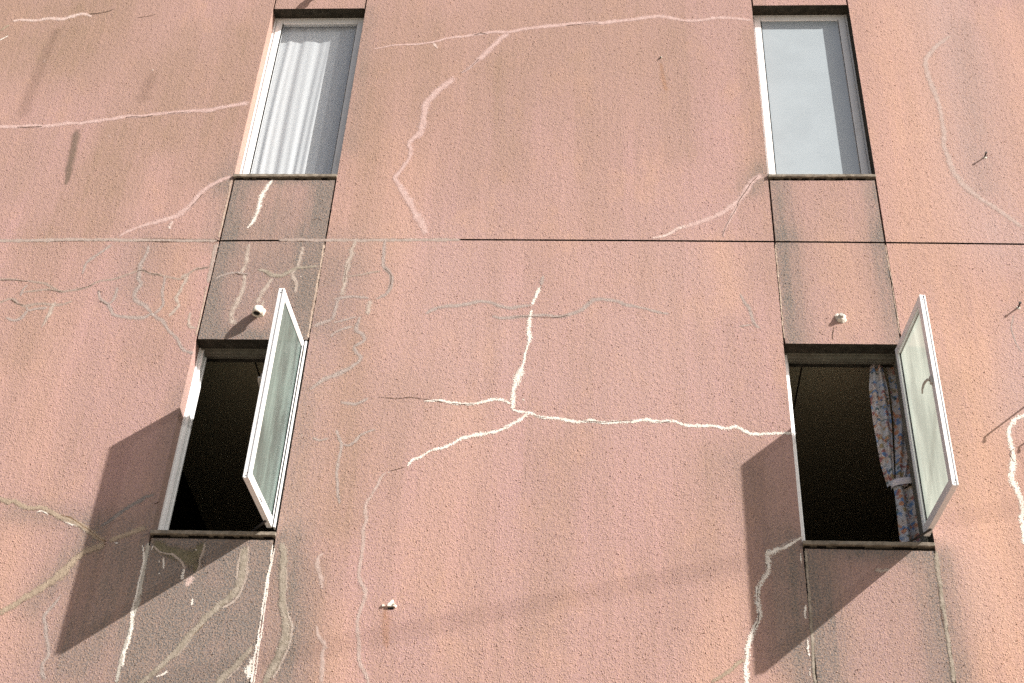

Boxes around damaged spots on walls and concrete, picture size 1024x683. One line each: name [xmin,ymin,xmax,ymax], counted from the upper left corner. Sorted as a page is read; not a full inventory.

crack [0,9,113,40]
crack [0,101,249,128]
crack [374,15,750,234]
crack [923,36,1023,227]
crack [0,176,317,355]
crack [653,174,763,239]
crack [313,276,805,683]
crack [1005,413,1024,544]
crack [139,547,250,683]
crack [216,543,327,683]